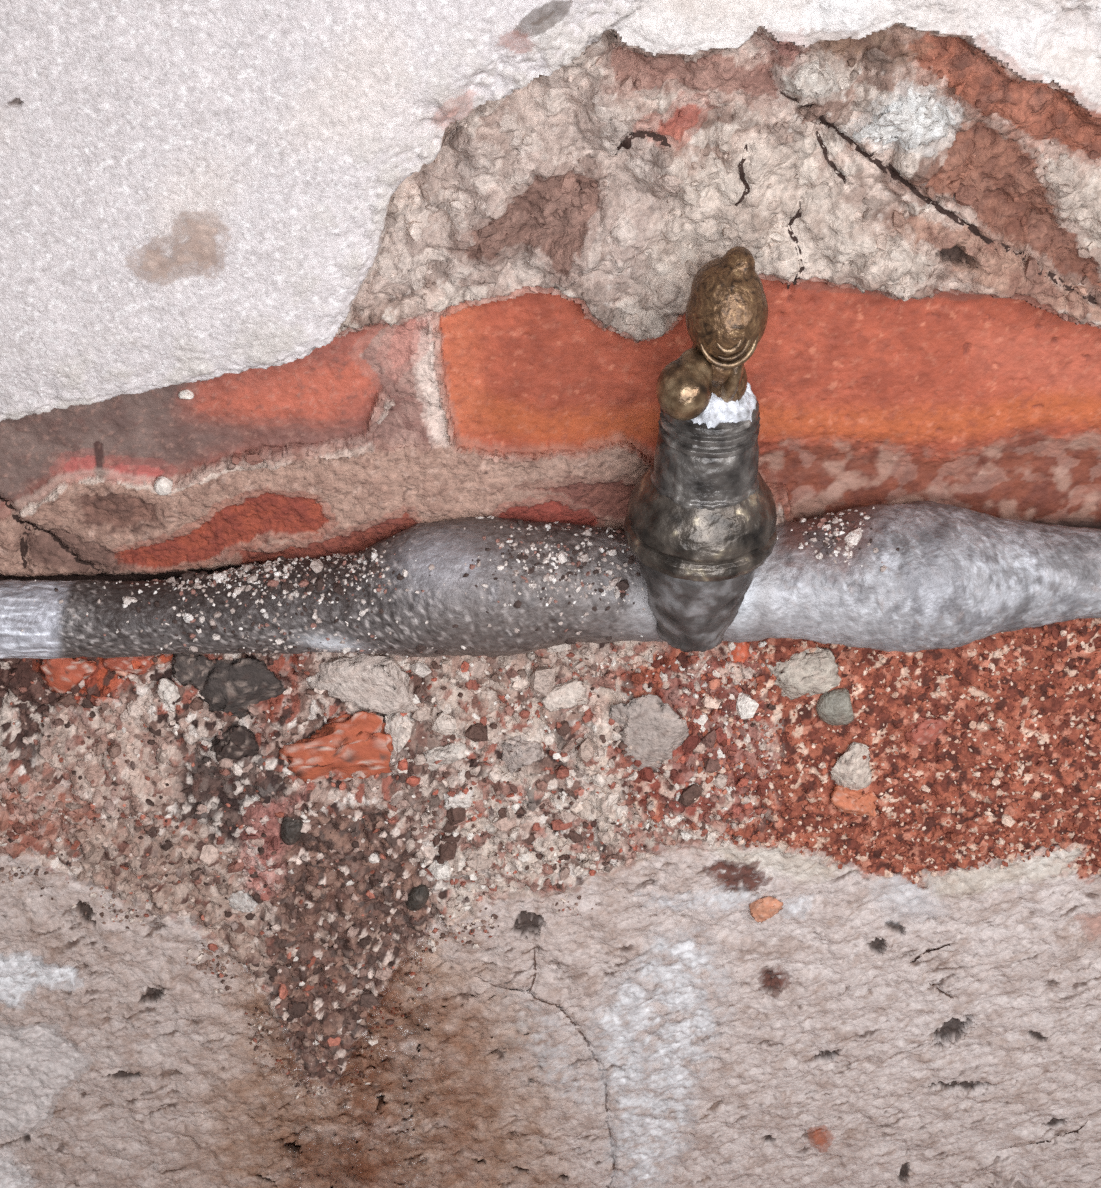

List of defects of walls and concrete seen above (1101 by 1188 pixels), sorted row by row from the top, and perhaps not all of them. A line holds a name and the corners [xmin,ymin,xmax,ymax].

spalling [515,2,568,34]
flaking render [0,23,1101,581]
crack [780,91,1101,309]
spalling [0,618,1101,1099]
crack [475,947,615,1188]
flaking render [1044,1118,1070,1128]